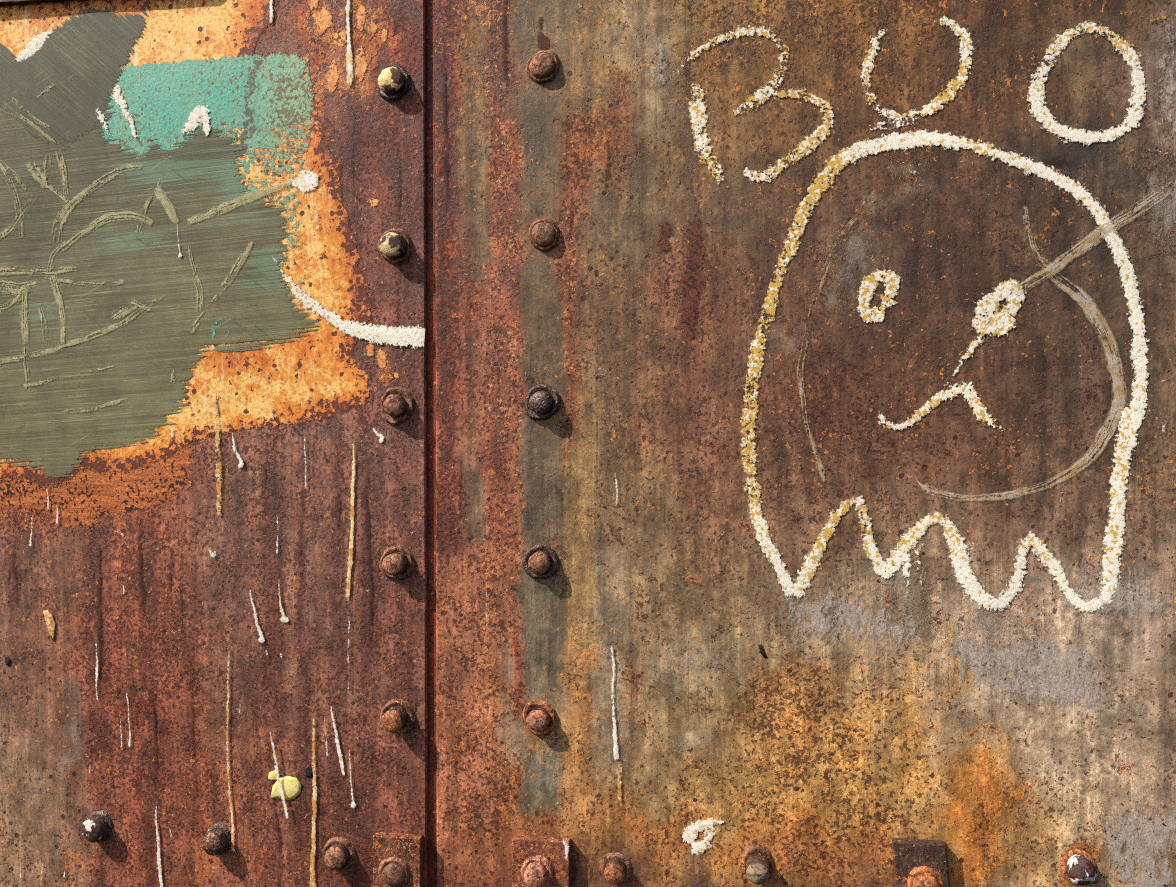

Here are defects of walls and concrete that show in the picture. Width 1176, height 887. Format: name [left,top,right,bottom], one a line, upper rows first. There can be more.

peeling [0,0,278,72]
peeling [307,0,388,93]
corrosion [536,16,550,51]
corrosion [441,53,449,207]
peeling [0,55,399,487]
corrosion [0,445,196,529]
corrosion [364,471,373,651]
corrosion [969,786,991,887]
corrosion [1057,836,1100,887]